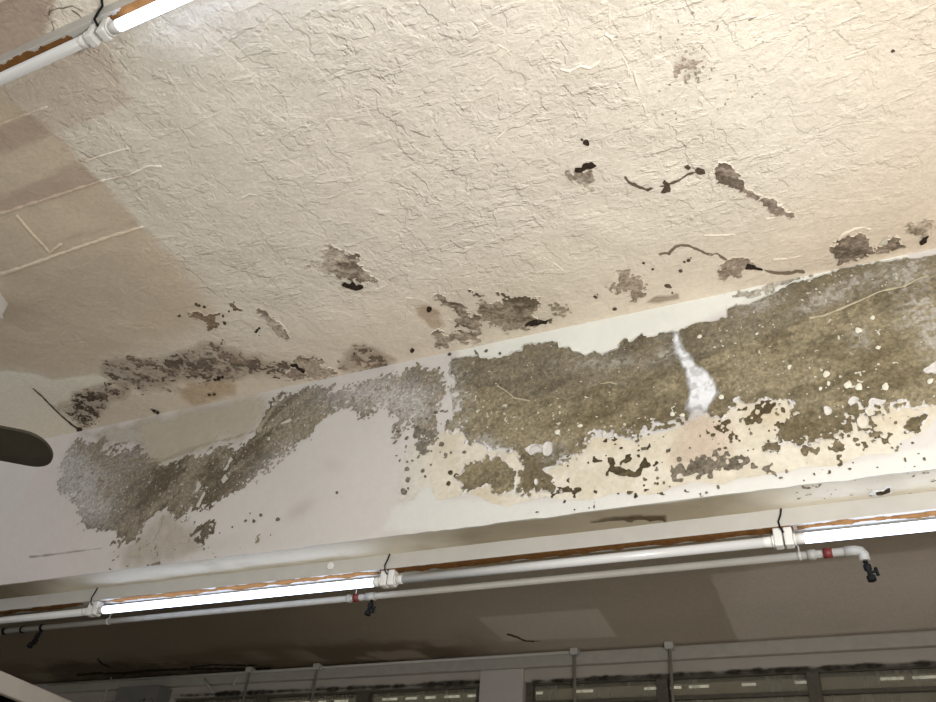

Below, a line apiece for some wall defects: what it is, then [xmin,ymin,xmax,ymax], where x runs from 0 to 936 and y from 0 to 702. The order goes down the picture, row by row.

peeling [659,11,715,92]
damp [55,339,295,427]
damp [337,345,389,372]
flaking render [54,215,936,570]